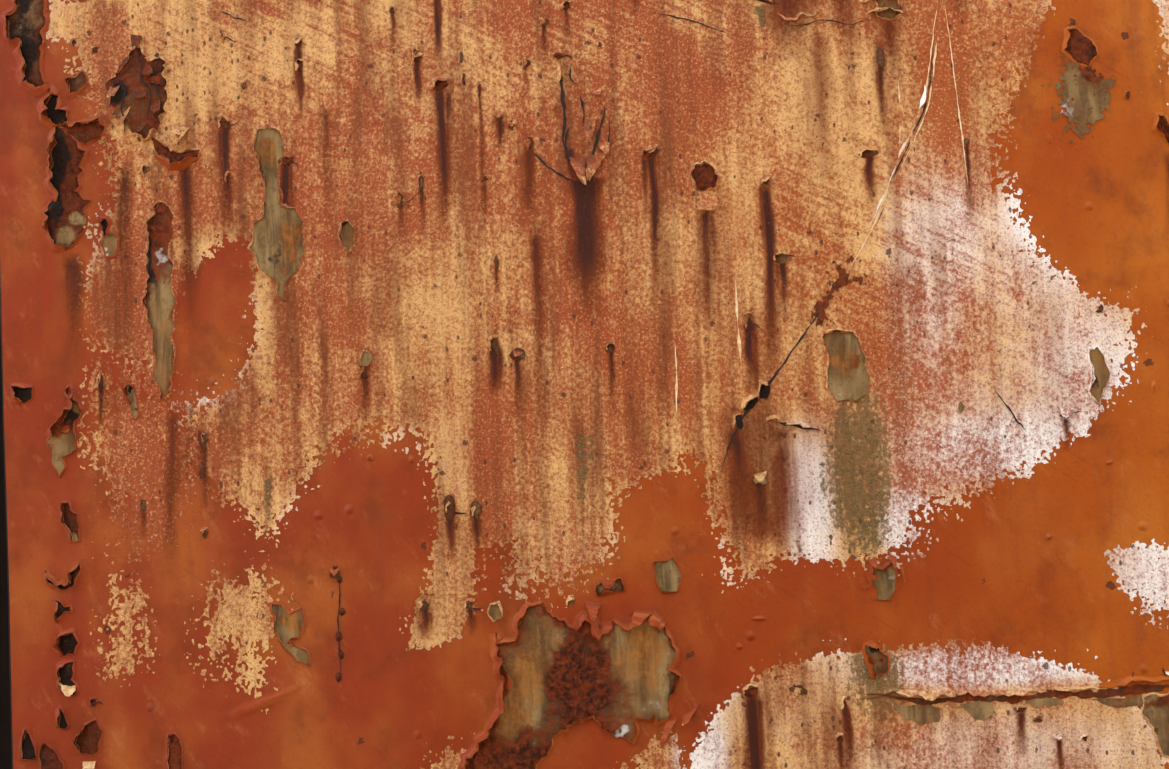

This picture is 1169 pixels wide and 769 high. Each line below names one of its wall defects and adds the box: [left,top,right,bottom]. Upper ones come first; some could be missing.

peeling [36,84,93,253]
corrosion [411,0,517,207]
corrosion [858,149,879,196]
corrosion [742,175,795,384]
corrosion [488,333,526,393]
crack [721,246,872,471]
peeling [184,550,311,698]
peeling [423,597,687,769]
peeling [688,692,748,769]
corrosion [742,684,765,769]
peeling [748,629,1169,769]
peeling [1104,538,1169,629]